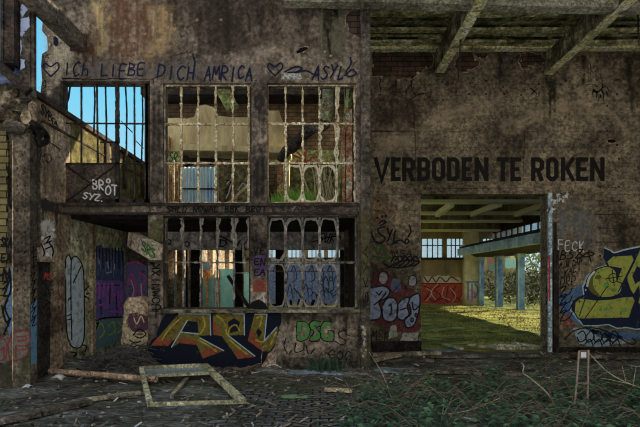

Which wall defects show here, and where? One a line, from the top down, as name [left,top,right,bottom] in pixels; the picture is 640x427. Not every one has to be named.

peeling [20,4,30,70]
peeling [316,8,361,63]
spalling [370,52,435,81]
spalling [454,52,490,74]
crack [589,62,611,104]